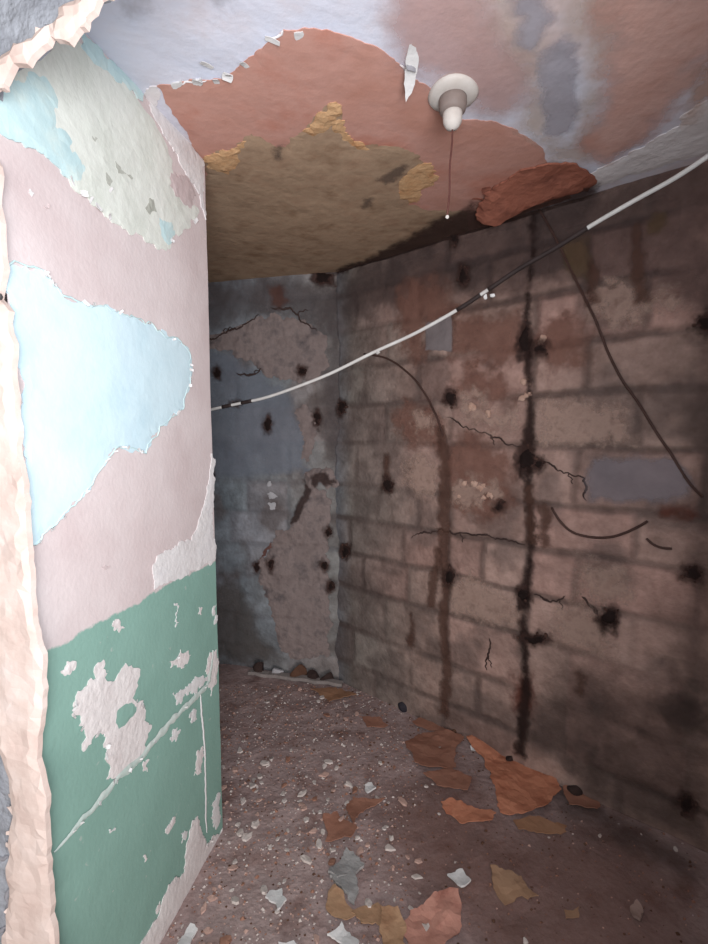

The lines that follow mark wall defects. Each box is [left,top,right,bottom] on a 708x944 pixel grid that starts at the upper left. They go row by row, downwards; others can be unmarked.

peeling [0,0,547,251]
water stain [560,0,708,162]
crack [209,307,317,340]
peeling [0,163,194,944]
peeling [152,453,217,590]
water stain [428,426,452,717]
crack [412,528,525,545]
crack [448,417,520,447]
water stain [522,354,535,447]
water stain [513,472,552,759]
crack [545,461,588,501]
peeling [140,792,259,944]